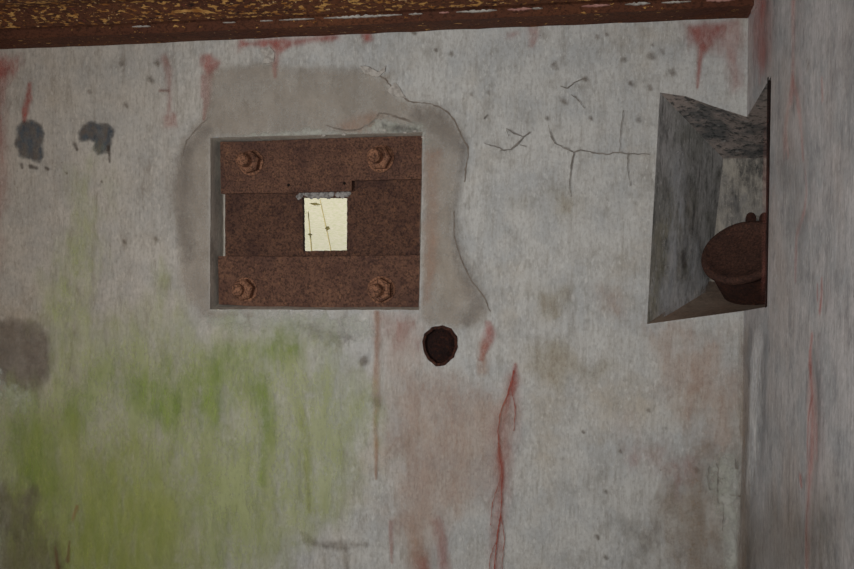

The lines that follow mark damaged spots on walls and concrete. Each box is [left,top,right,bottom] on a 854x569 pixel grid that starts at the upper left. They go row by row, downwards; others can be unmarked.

crack [485,110,649,197]